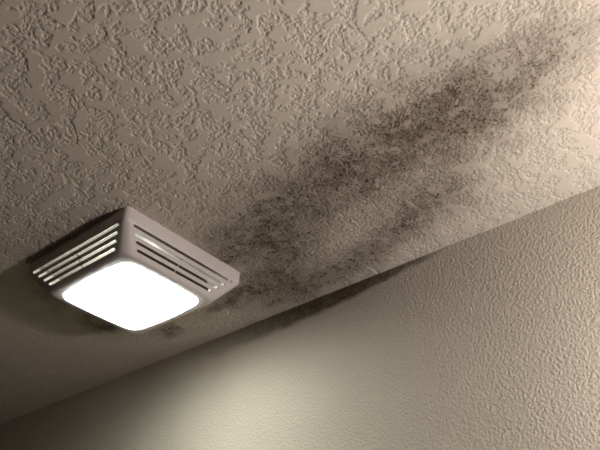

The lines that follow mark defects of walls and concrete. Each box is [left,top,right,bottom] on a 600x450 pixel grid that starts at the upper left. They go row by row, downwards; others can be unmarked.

damp [211,34,565,329]